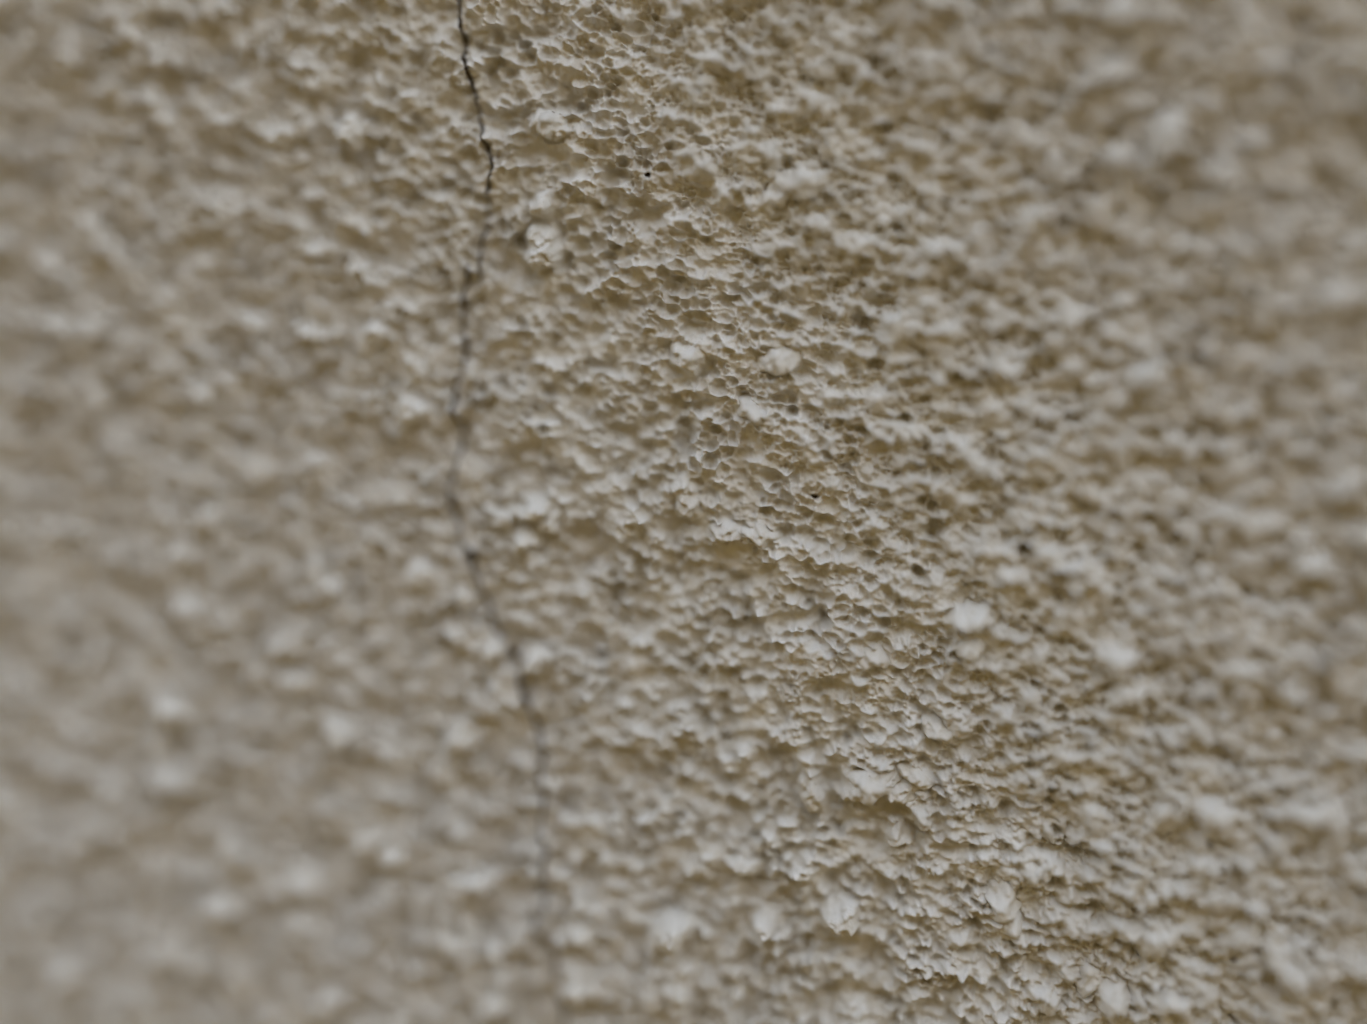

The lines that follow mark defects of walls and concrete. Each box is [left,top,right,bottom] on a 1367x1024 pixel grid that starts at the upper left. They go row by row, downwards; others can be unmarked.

crack [447,0,567,1024]